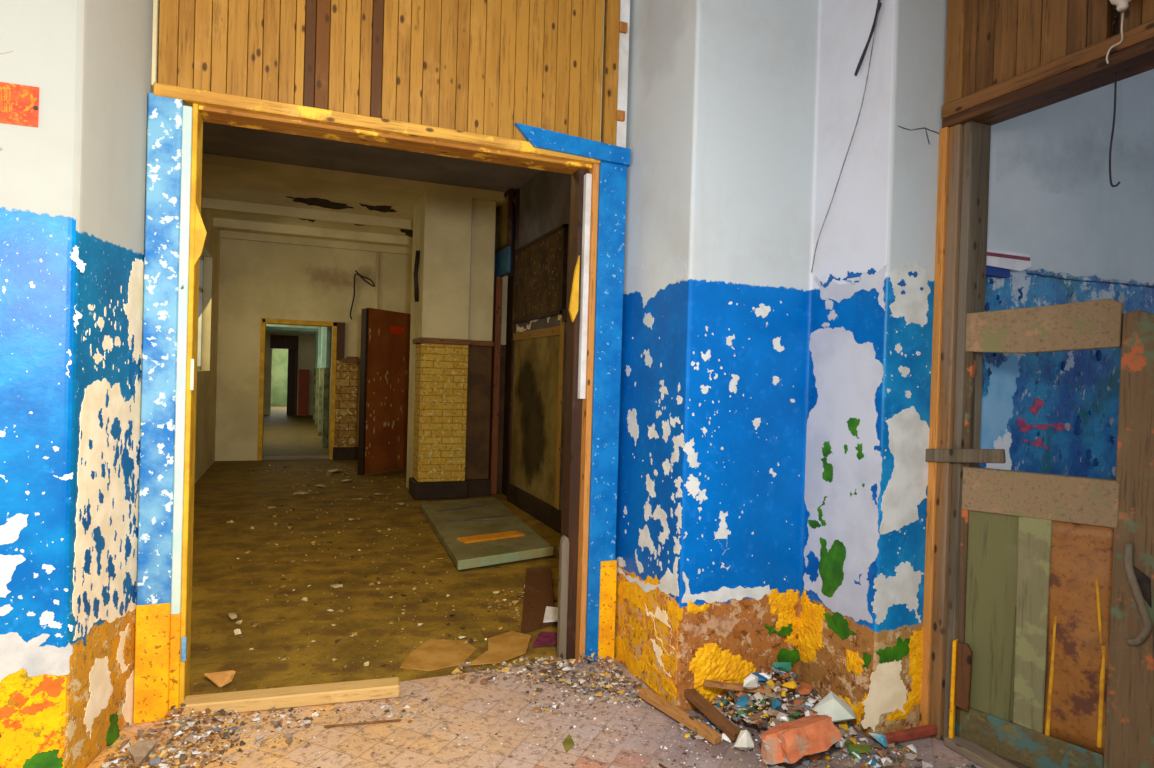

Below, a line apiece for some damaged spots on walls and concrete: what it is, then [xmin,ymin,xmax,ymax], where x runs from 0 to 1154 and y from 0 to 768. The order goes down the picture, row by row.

peeling [56,245,86,273]
flaking render [286,196,398,223]
peeling [980,353,1052,470]
peeling [0,258,144,746]
peeling [615,255,931,732]
peeling [23,749,63,768]